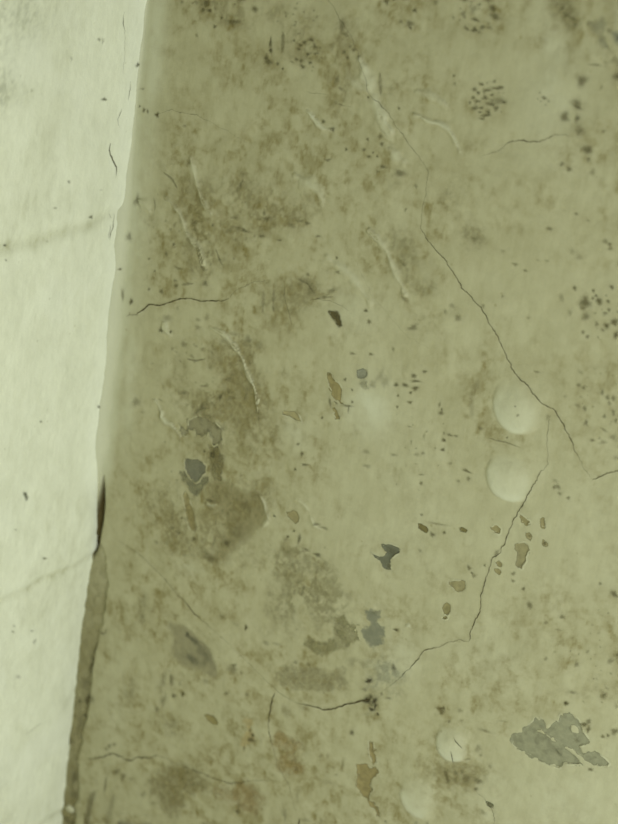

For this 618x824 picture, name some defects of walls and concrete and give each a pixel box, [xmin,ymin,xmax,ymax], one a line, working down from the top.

crack [126,298,227,317]
crack [425,236,574,447]
peeling [327,373,343,419]
peeling [179,415,223,531]
peeling [371,542,400,569]
crack [462,473,540,642]
peeling [309,602,391,656]
crack [307,699,370,710]
peeling [510,703,611,770]
peeling [356,741,380,816]